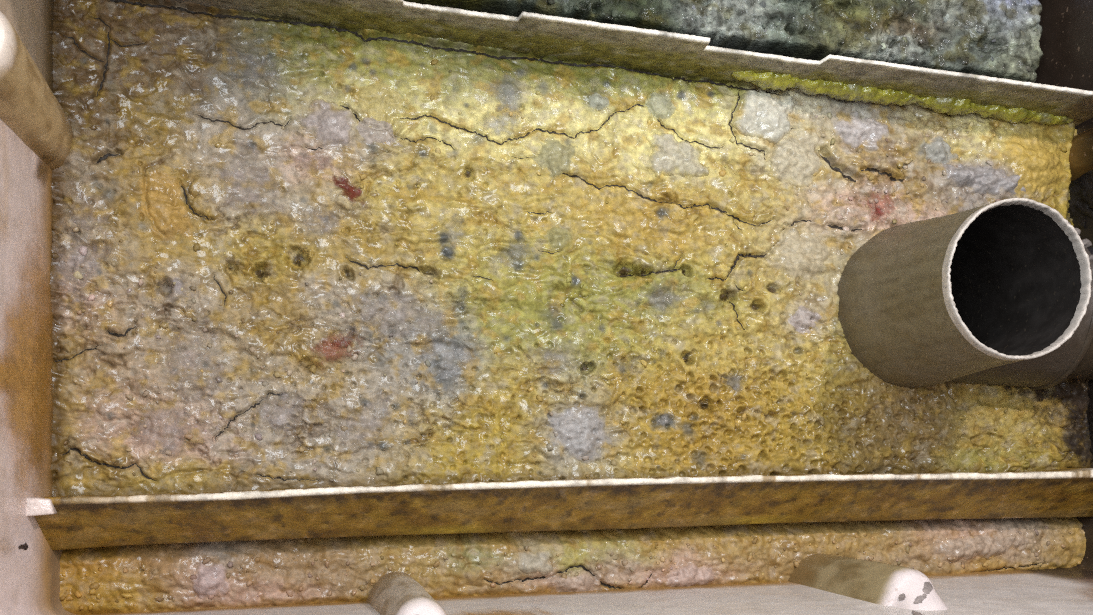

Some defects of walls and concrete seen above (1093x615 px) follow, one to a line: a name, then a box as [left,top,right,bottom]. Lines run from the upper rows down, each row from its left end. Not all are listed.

crack [393,93,765,159]
crack [820,154,904,182]
crack [346,257,420,272]
crack [562,173,862,330]
crack [215,392,289,440]
crack [63,448,156,481]
crack [257,473,319,481]